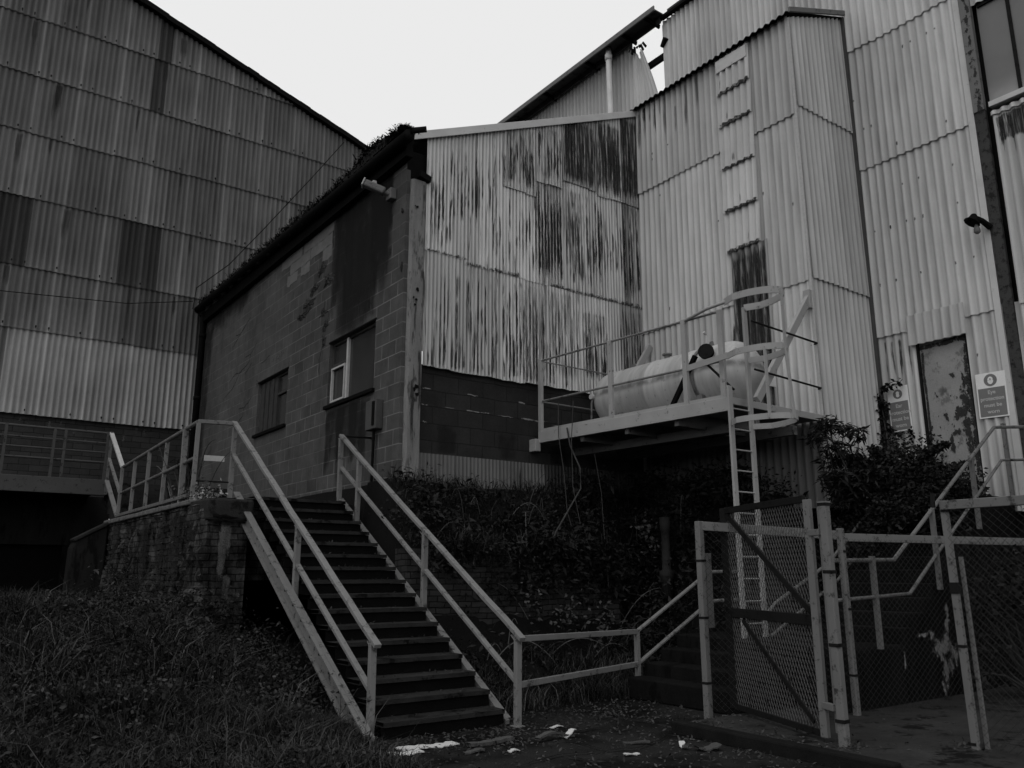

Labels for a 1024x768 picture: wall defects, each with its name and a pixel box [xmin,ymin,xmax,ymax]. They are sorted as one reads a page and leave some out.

leakage [331,174,393,331]